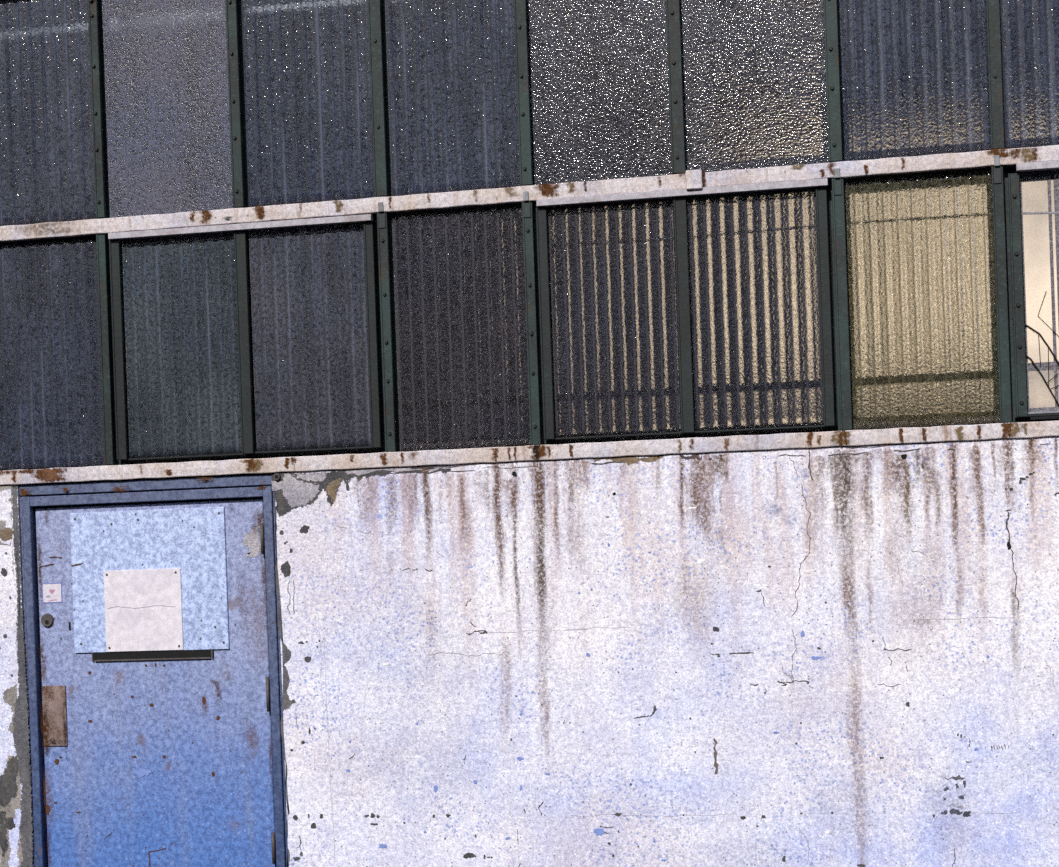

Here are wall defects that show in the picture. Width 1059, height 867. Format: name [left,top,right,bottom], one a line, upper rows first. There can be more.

corrosion [538,181,587,196]
corrosion [988,148,1037,162]
corrosion [492,445,551,571]
peeling [593,455,663,465]
crack [290,439,991,688]
corrosion [807,431,851,446]
corrosion [952,426,963,531]
crack [905,488,1019,620]
corrosion [971,422,1033,509]
peeling [0,484,34,867]
spalling [271,465,451,867]
spalling [933,775,971,818]